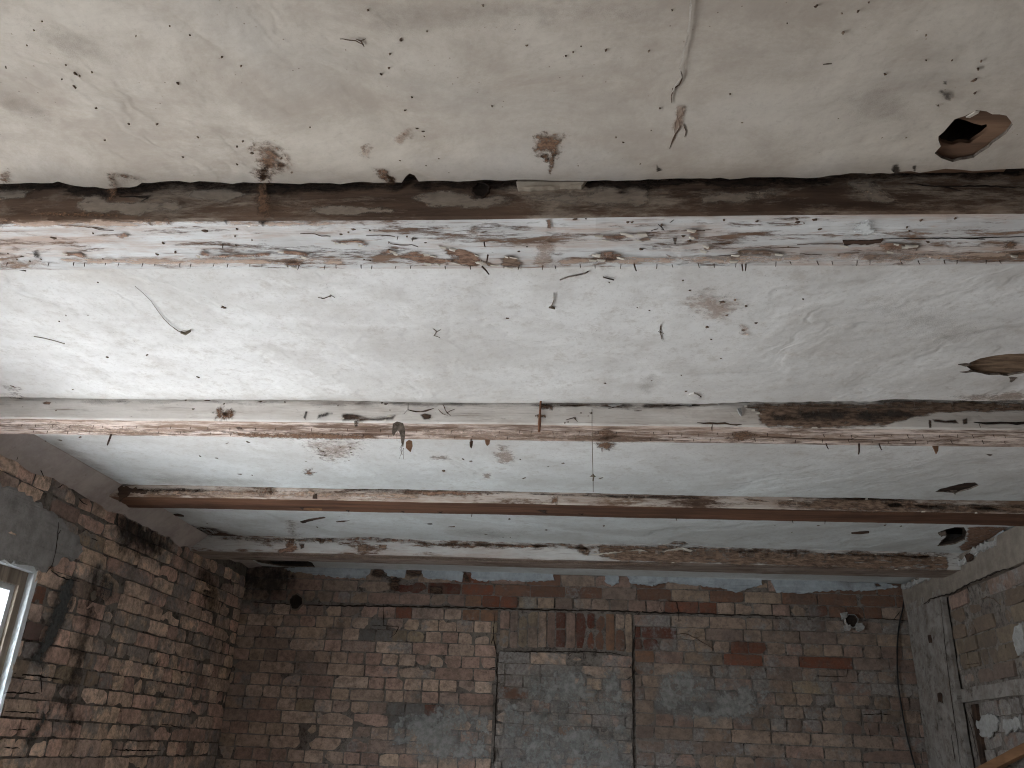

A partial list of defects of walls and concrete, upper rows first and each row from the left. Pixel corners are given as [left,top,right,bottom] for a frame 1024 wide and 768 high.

peeling [196,250,308,269]
peeling [380,238,522,269]
peeling [589,232,650,262]
peeling [667,229,713,257]
peeling [730,250,784,263]
spalling [840,222,919,254]
peeling [737,401,1024,429]
peeling [278,537,547,553]
peeling [959,527,1008,551]
peeling [1002,714,1023,736]